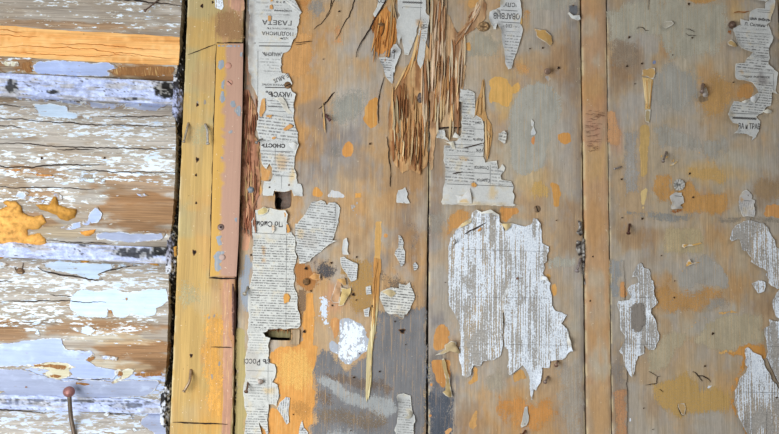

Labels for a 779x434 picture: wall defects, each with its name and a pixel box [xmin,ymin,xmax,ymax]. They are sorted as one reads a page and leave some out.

crack [295,0,355,45]
crack [356,0,386,57]
peeling [21,60,175,77]
peeling [281,33,314,80]
peeling [18,98,167,119]
peeling [60,207,165,243]
peeling [447,208,470,236]
peeling [499,207,519,222]
peeling [43,261,139,280]
peeling [70,289,168,336]
peeling [0,330,162,401]
peeling [726,343,767,417]